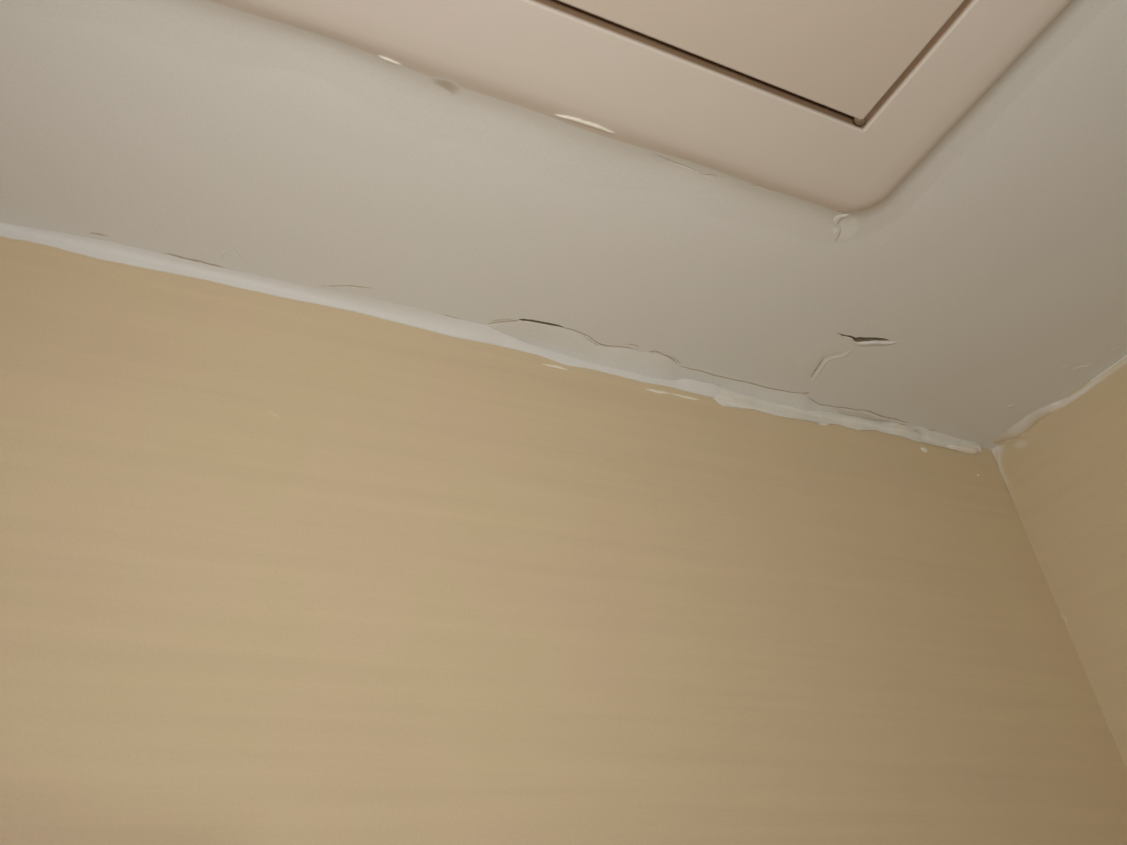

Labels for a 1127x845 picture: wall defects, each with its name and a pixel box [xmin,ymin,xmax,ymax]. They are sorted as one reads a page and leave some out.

peeling [554,114,616,134]
crack [489,319,910,424]